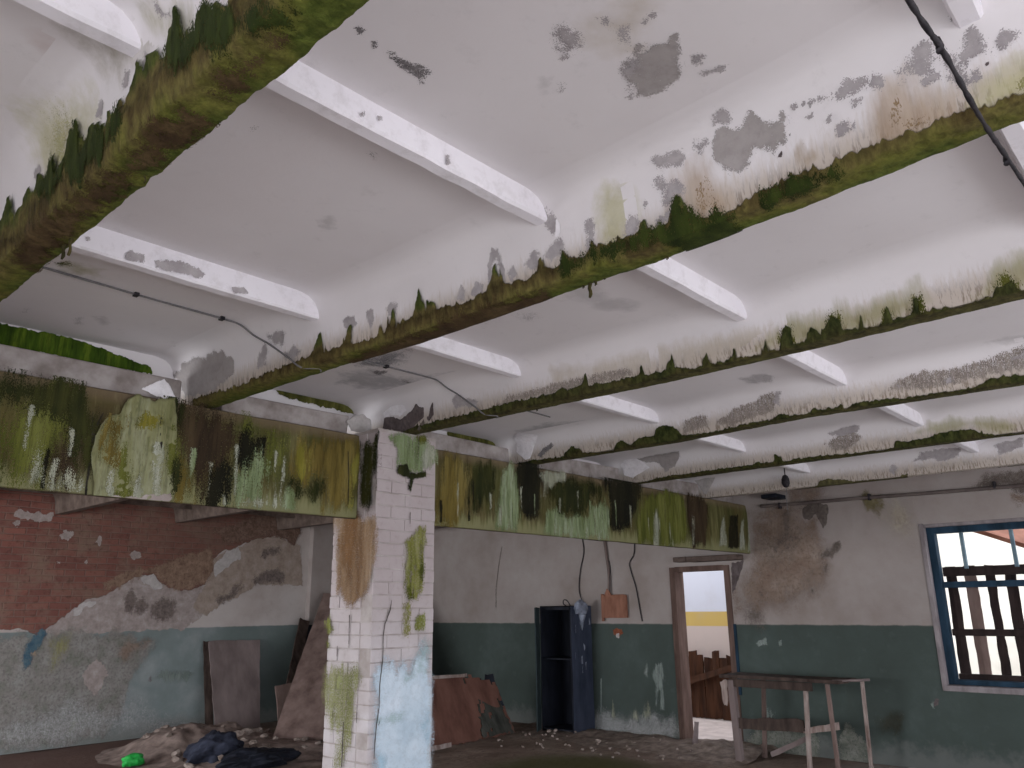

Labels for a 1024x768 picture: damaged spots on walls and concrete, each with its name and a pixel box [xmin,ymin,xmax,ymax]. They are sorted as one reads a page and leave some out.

leakage [0,12,165,192]
peeling [551,22,586,61]
peeling [618,33,729,100]
peeling [651,24,1021,225]
leakage [585,171,649,246]
peeling [623,201,648,238]
leakage [553,278,650,315]
peeling [173,350,234,398]
leakage [541,319,775,391]
leakage [177,399,313,512]
leakage [493,443,643,541]
spalling [0,490,303,652]